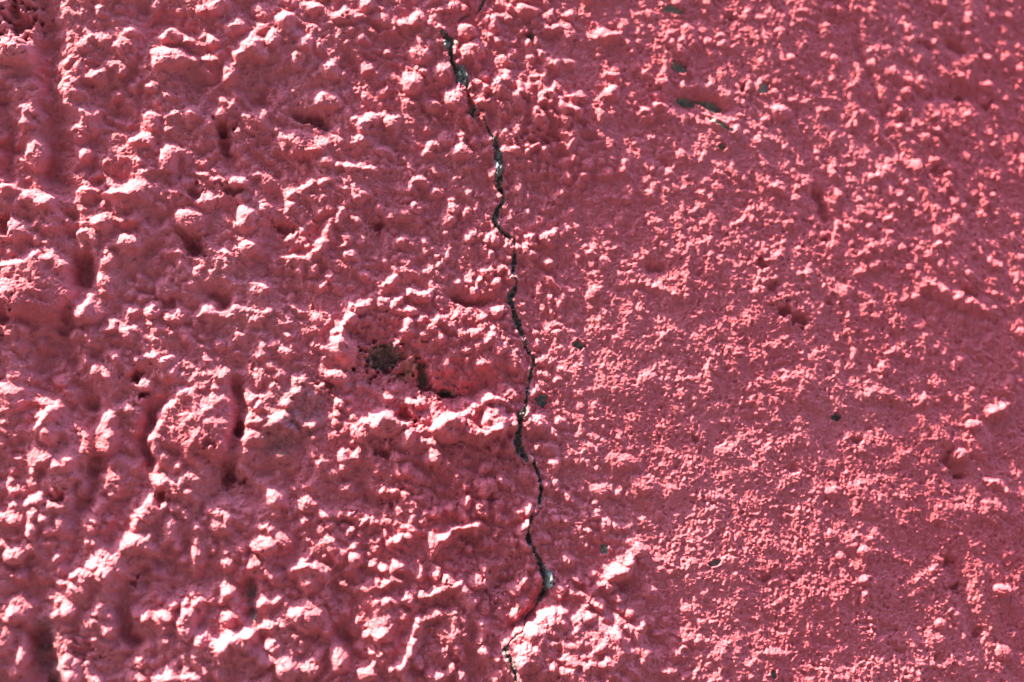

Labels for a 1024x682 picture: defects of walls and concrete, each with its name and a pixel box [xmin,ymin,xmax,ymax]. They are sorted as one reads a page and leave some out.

crack [440,0,554,682]